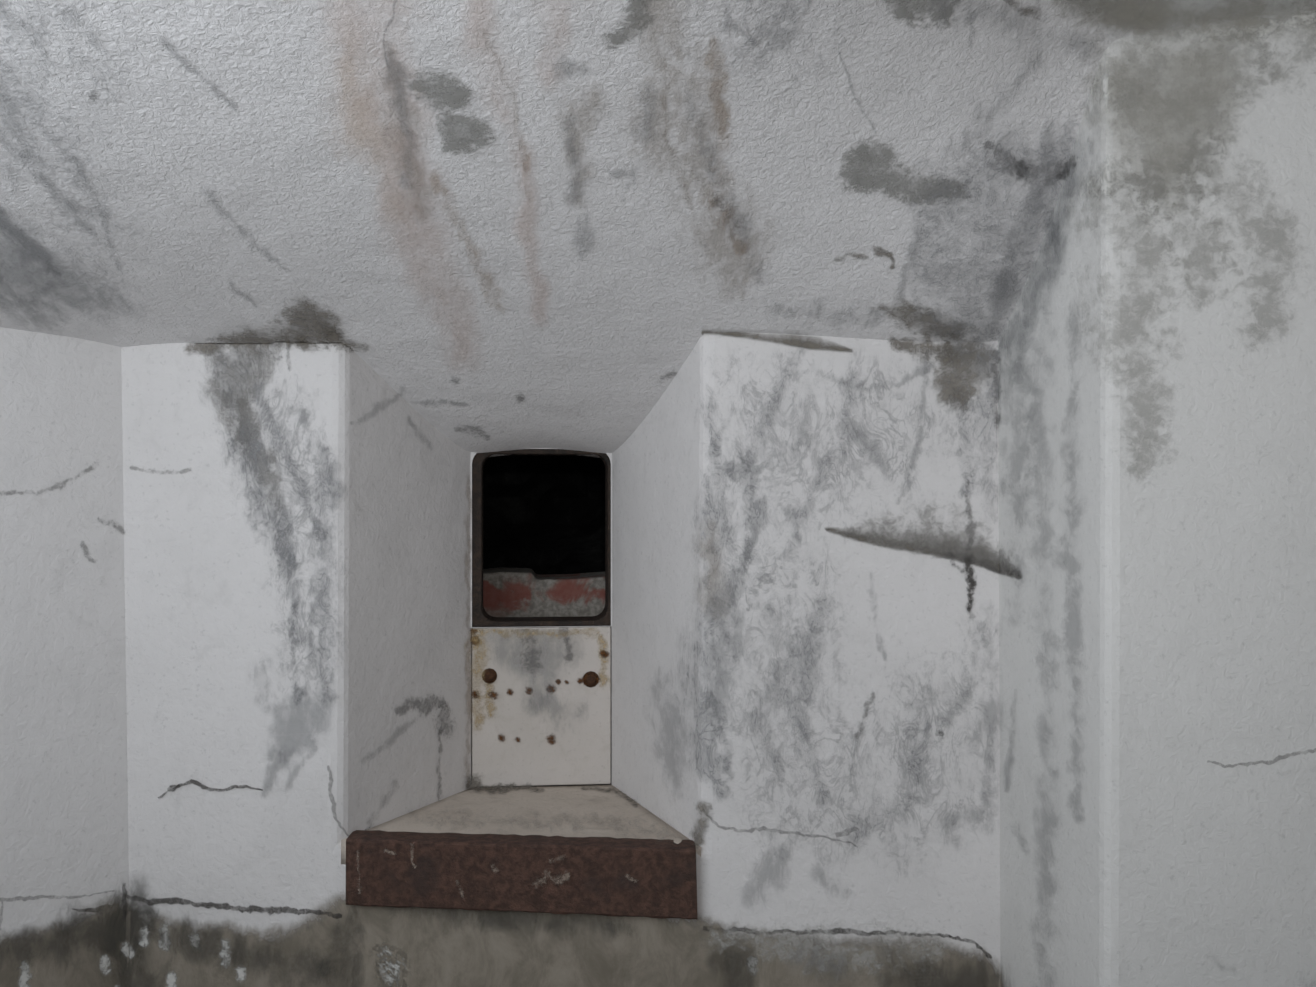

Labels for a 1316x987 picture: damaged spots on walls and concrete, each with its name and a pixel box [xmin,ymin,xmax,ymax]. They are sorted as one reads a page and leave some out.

leakage [1071,0,1316,31]
leakage [915,137,1075,438]
rust [472,670,600,699]
crack [158,779,263,798]
crack [83,891,342,919]